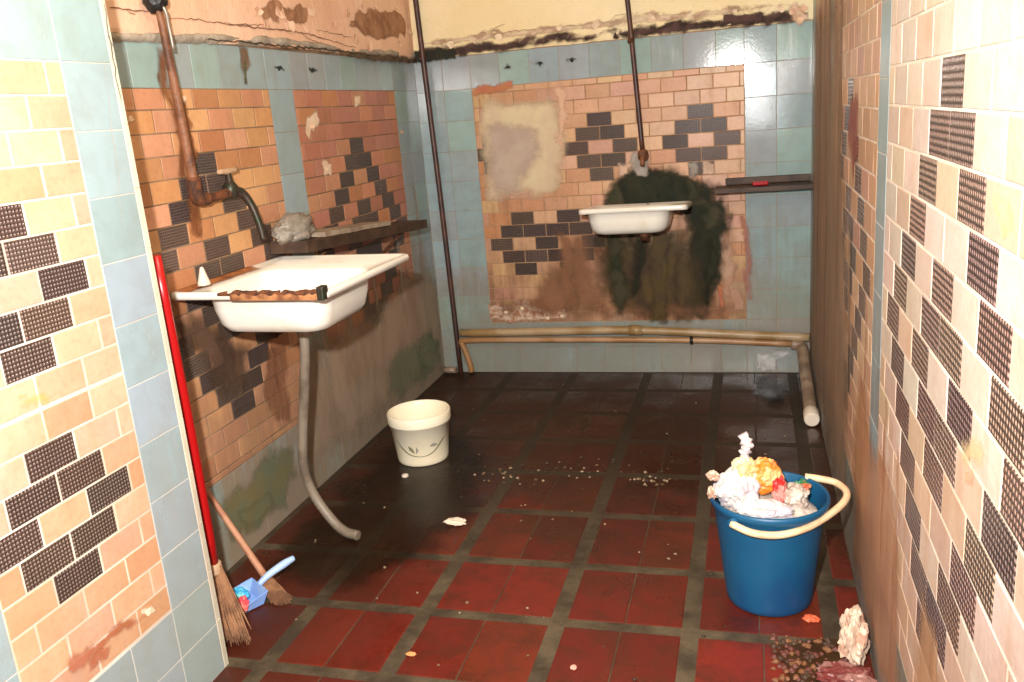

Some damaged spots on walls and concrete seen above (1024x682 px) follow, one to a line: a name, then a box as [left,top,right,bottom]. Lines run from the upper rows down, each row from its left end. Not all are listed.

spalling [254,0,315,34]
spalling [331,0,413,52]
water stain [414,32,596,62]
peeling [431,6,743,49]
spalling [778,2,809,25]
corrosion [158,52,198,177]
spalling [305,111,319,138]
corrosion [848,95,858,171]
corrosion [189,199,202,236]
water stain [504,168,744,323]
water stain [608,0,850,484]
corrosion [69,620,134,671]